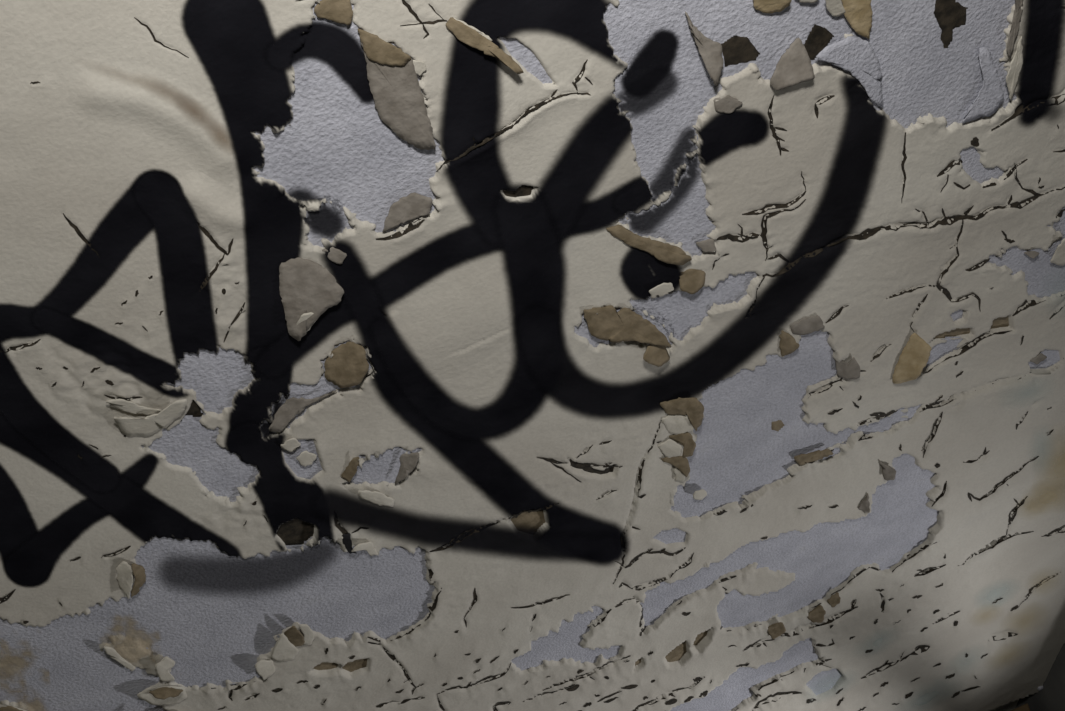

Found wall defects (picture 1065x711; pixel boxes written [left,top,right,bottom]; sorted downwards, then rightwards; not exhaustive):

peeling [252,0,445,341]
peeling [574,0,1023,367]
crack [712,94,1065,373]
crack [0,339,41,353]
peeling [106,347,259,502]
peeling [0,533,436,711]
peeling [260,340,372,480]
peeling [341,447,422,507]
peeling [653,316,922,544]
peeling [640,444,940,647]
crack [809,344,891,396]
crack [857,372,1031,458]